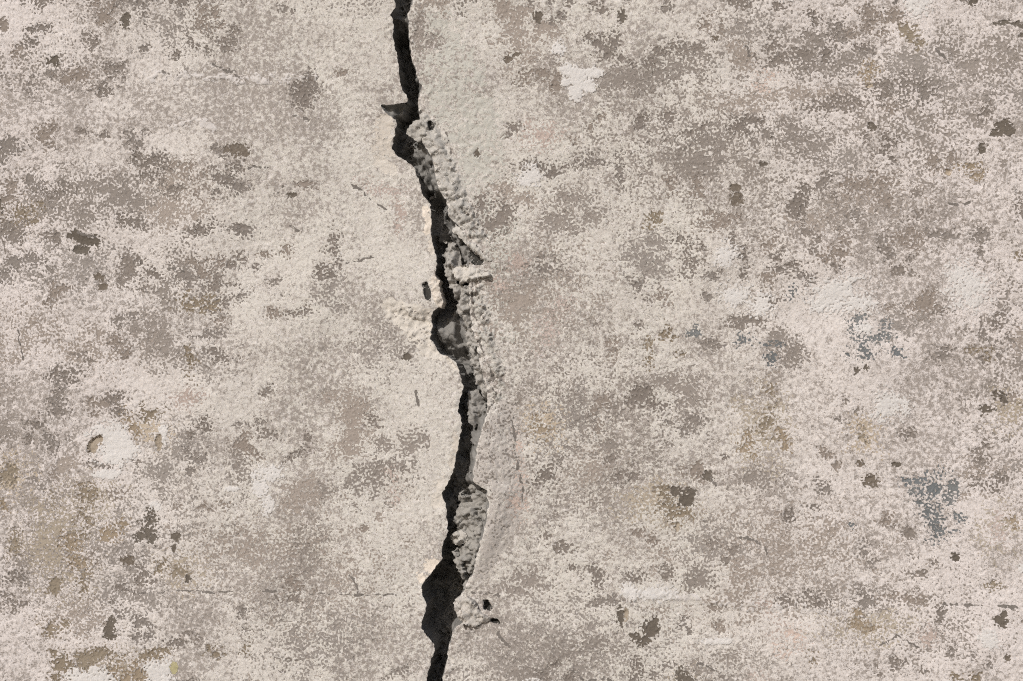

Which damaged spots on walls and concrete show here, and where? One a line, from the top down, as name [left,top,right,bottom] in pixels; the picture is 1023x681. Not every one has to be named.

crack [212,63,240,78]
crack [350,182,387,210]
crack [379,0,525,681]
crack [137,574,396,597]